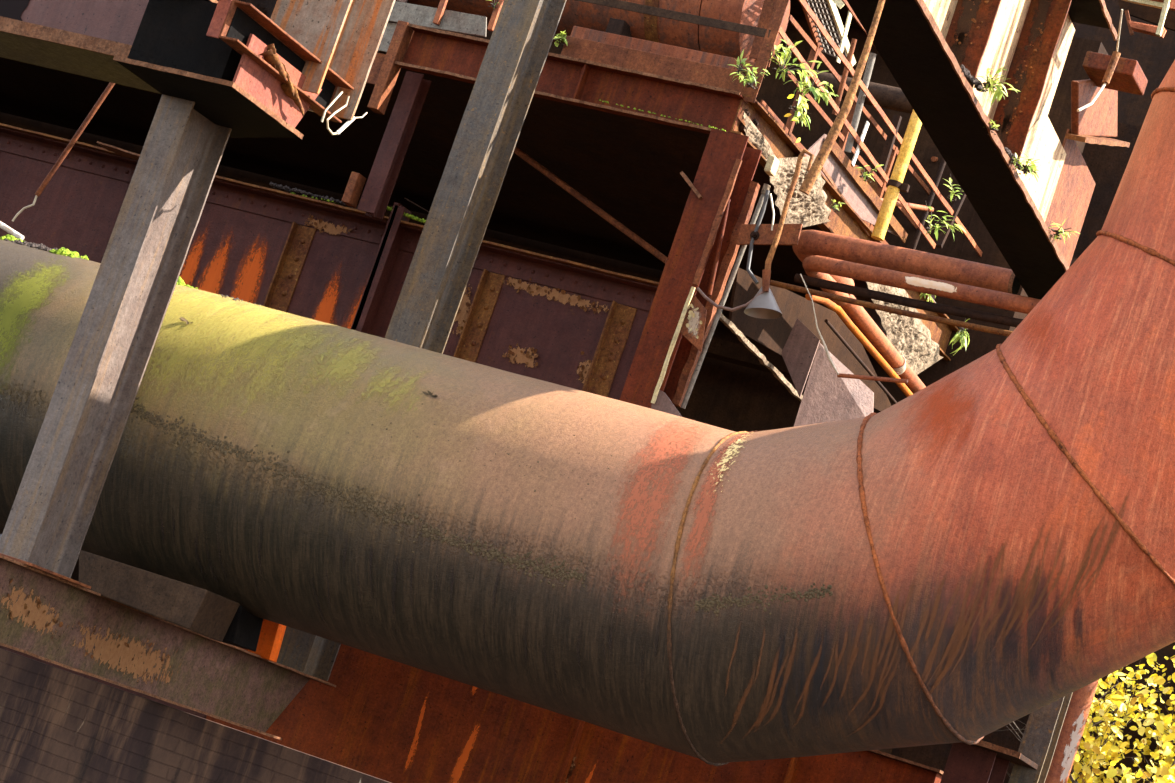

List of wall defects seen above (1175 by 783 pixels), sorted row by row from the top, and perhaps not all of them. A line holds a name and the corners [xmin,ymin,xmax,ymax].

rust [997,0,1055,146]
rust [180,234,266,304]
rust [314,276,366,329]
peeling [452,284,472,336]
peeling [492,272,611,314]
peeling [502,343,538,368]
rust [519,421,707,595]
rust [682,431,754,579]
rust [910,513,1120,688]
rust [797,588,912,730]
rust [405,696,428,769]
rust [451,724,480,783]